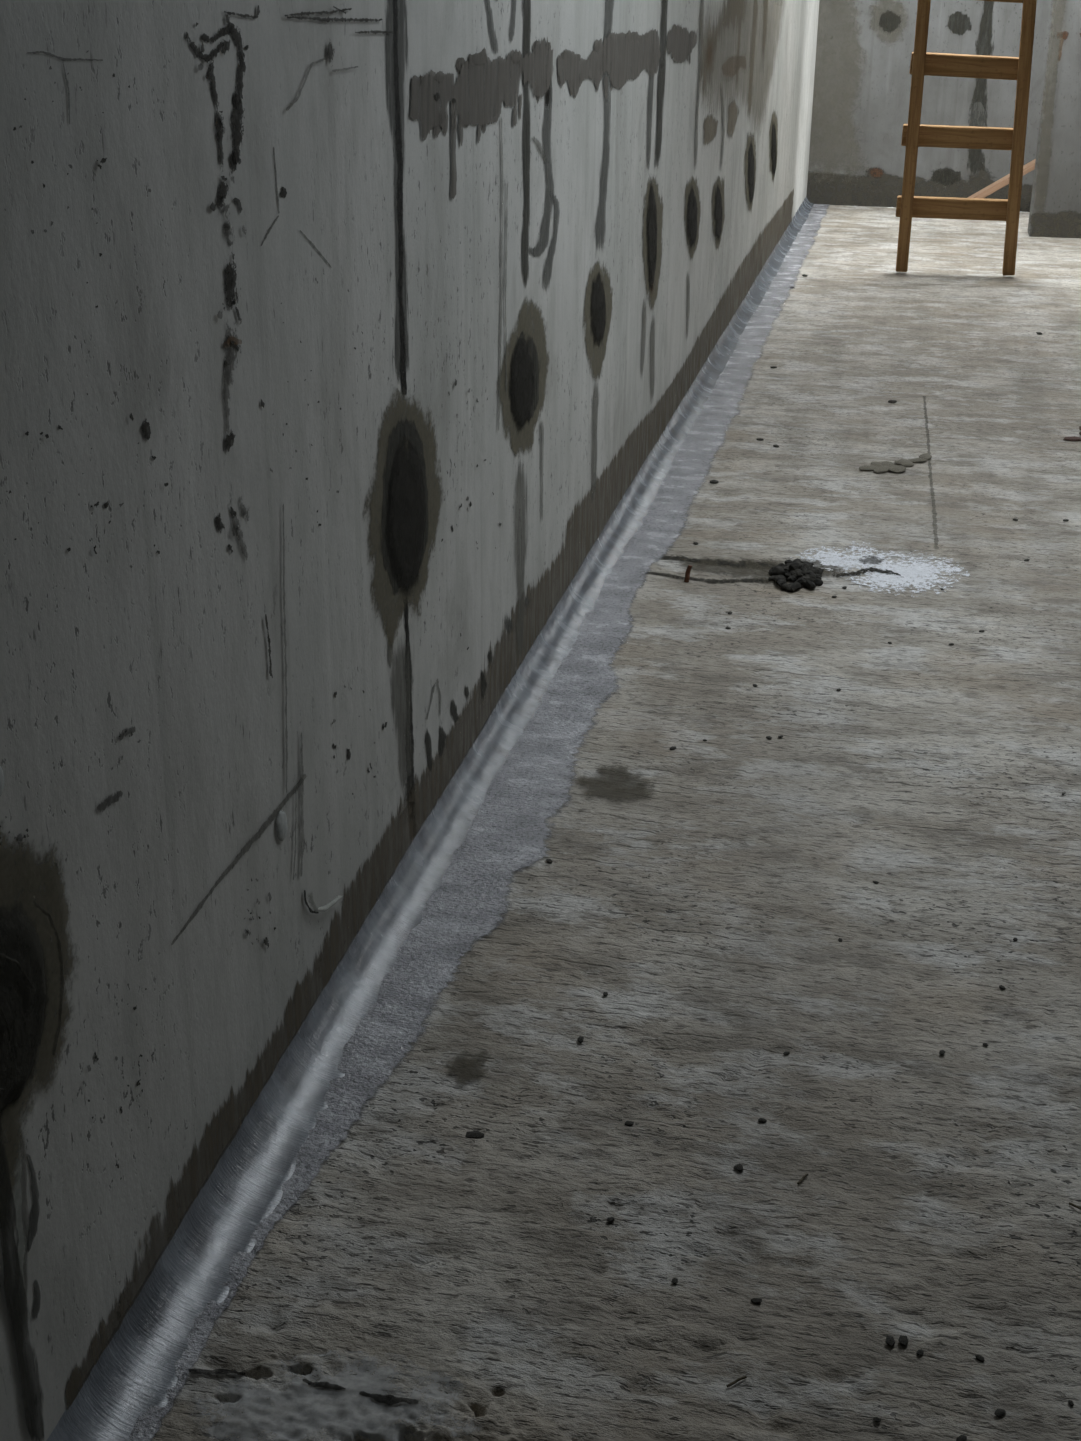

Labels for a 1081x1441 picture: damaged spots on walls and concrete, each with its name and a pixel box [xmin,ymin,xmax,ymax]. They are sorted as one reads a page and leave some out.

crack [385,0,409,395]
water stain [410,0,725,518]
water stain [745,111,778,212]
water stain [806,0,1081,239]
water stain [790,541,971,597]
crack [388,599,416,819]
water stain [65,189,794,1409]
water stain [0,825,74,1192]
spalling [191,1349,581,1441]